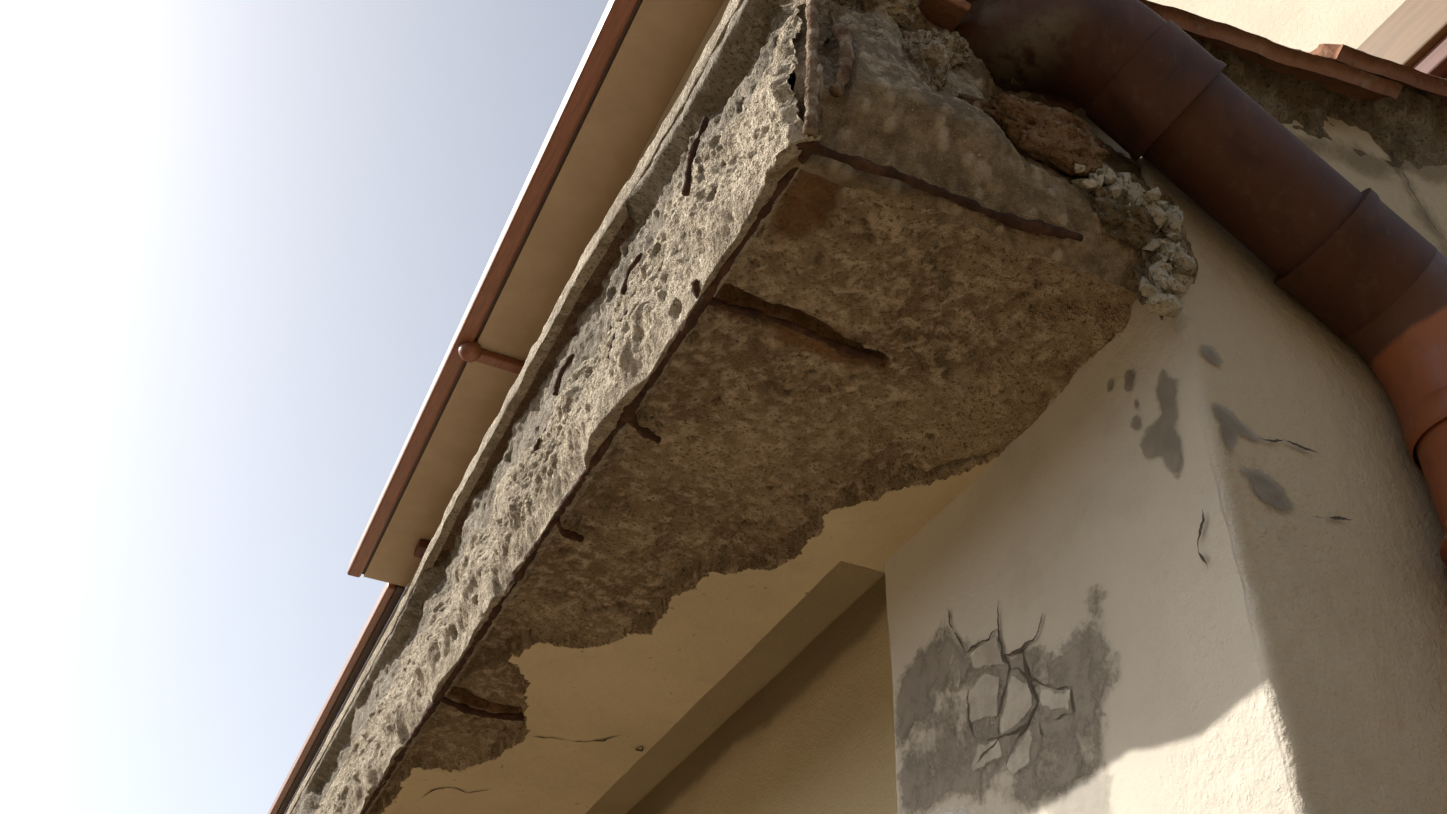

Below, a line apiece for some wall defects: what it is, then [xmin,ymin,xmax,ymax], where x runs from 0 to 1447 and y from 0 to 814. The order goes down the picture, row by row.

corrosion [774,169,841,237]
corrosion [716,283,887,371]
spalling [314,0,1199,814]
corrosion [450,686,518,713]
crack [948,606,1074,775]